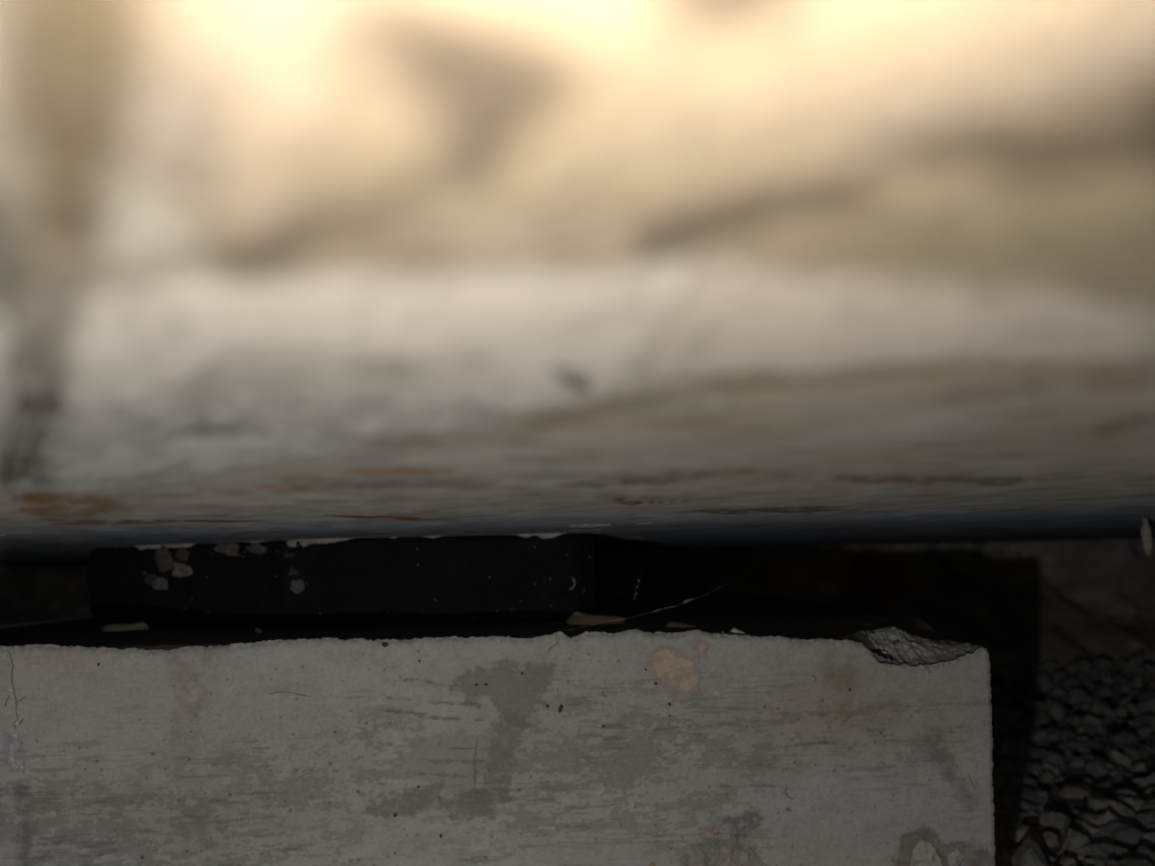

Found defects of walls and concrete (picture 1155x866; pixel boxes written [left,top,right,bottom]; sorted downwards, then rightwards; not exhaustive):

spalling [839,627,984,666]
crack [4,652,29,773]
leakage [368,659,555,817]